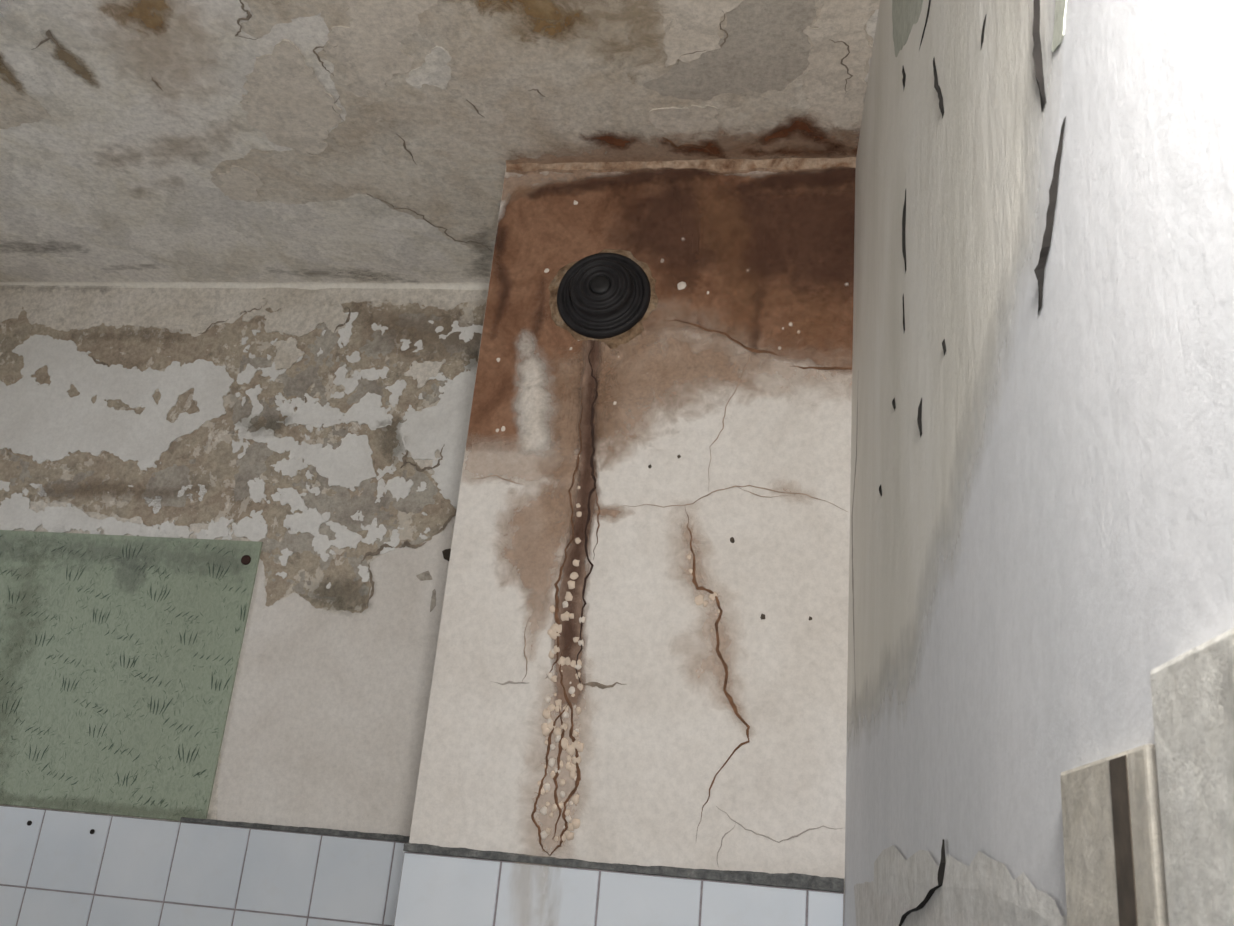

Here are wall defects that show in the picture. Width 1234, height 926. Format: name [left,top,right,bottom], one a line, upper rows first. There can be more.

peeling [0,59,51,129]
crack [902,0,944,119]
crack [980,13,988,48]
crack [1032,0,1066,313]
crack [900,190,908,331]
peeling [0,297,487,613]
peeling [210,0,1067,732]
crack [892,398,922,438]
crack [594,347,882,864]
crack [584,681,623,689]